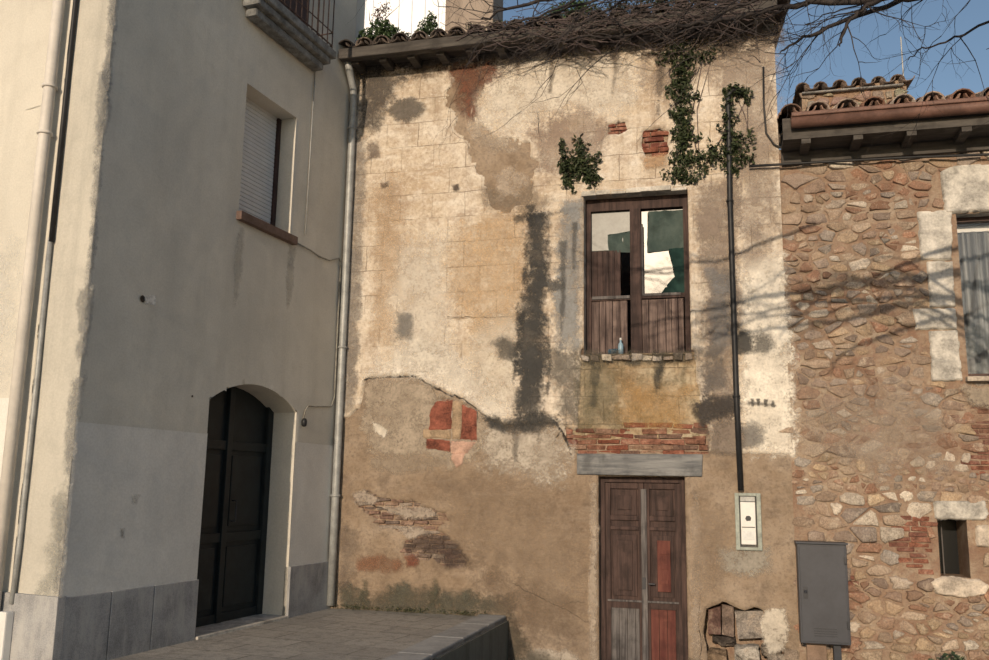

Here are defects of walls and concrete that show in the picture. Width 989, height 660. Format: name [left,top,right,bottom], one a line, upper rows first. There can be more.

damp [95,57,111,131]
flaking render [528,112,627,172]
spalling [565,36,777,456]
damp [484,199,584,456]
damp [692,268,772,427]
flaking render [372,422,387,437]
spalling [423,399,478,468]
damp [741,423,763,447]
spalling [353,490,466,569]